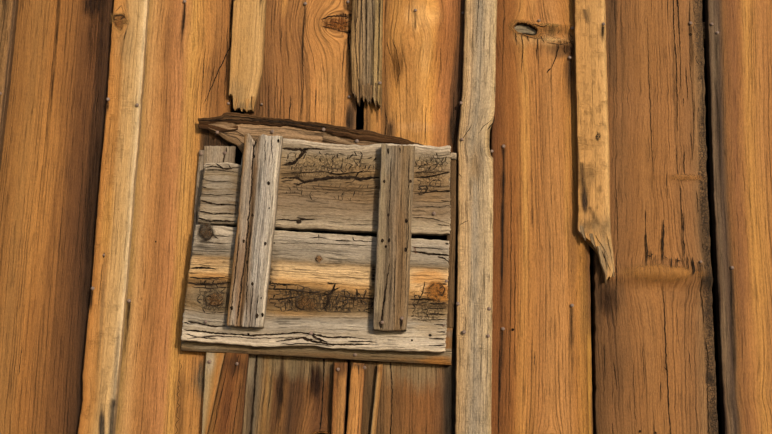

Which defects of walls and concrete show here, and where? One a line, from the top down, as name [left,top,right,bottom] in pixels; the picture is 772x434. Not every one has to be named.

crack [184,0,466,434]